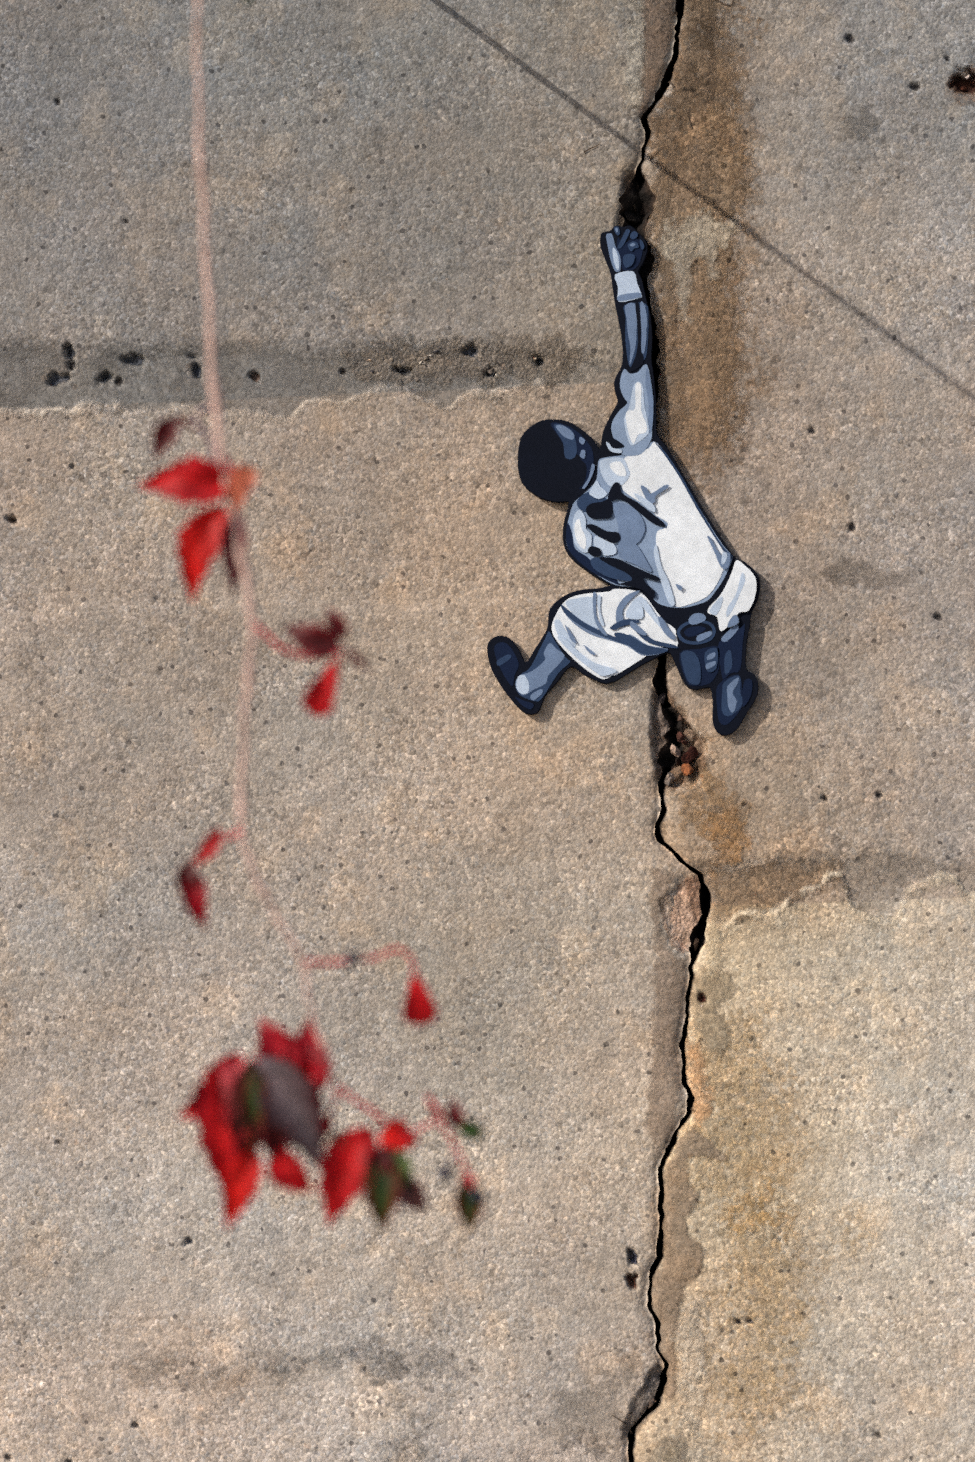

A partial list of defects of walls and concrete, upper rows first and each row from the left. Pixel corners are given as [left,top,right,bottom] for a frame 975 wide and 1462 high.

water stain [623,0,675,114]
corrosion [947,68,975,102]
crack [618,0,734,403]
water stain [661,209,735,320]
crack [612,654,713,1462]